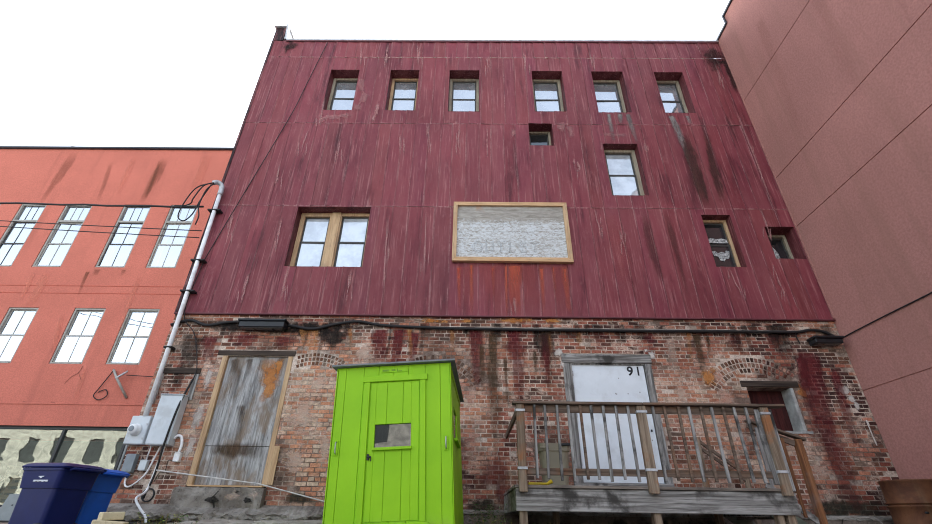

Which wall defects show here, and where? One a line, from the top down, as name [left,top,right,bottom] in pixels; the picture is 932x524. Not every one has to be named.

water stain [669,116,723,195]
water stain [390,324,426,356]
water stain [480,324,564,391]
corrosion [262,361,283,398]
water stain [830,371,849,411]